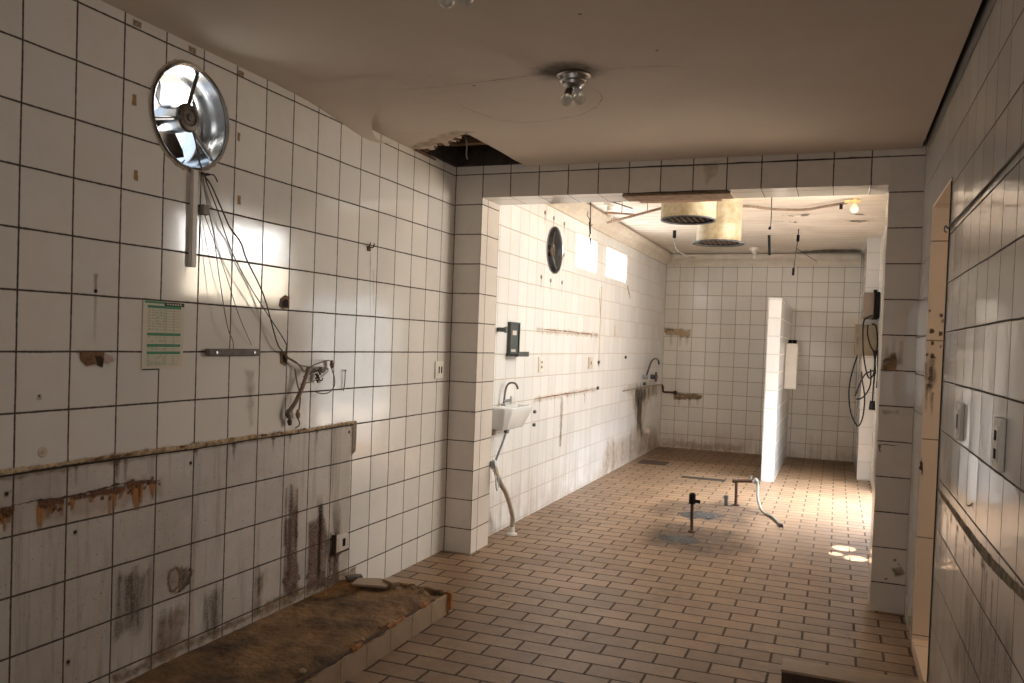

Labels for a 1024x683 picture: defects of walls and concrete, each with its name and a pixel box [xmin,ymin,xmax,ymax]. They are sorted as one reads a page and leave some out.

peeling [413,135,462,161]
spalling [80,352,114,367]
water stain [636,386,645,429]
rust [0,476,160,530]
water stain [317,508,340,585]
water stain [167,567,194,594]